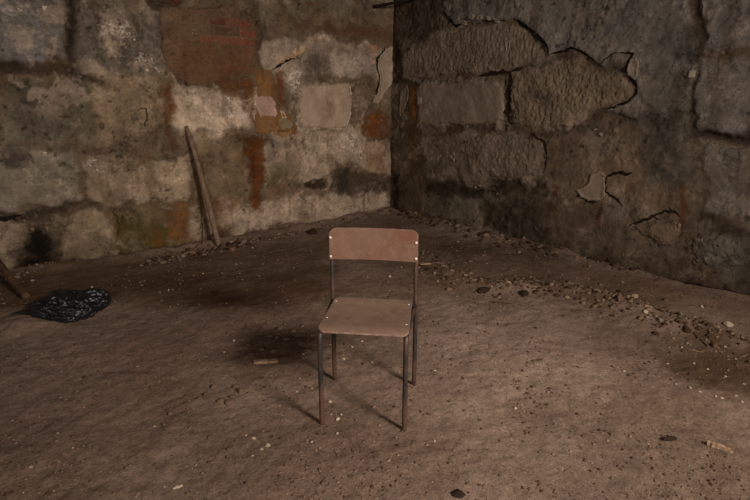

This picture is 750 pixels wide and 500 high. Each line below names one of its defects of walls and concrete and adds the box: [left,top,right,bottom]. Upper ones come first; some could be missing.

peeling [254,46,306,138]
crack [271,55,301,72]
crack [364,46,386,118]
spalling [289,0,642,129]
damp [17,230,61,267]
rust [244,136,270,210]
peeling [576,171,606,204]
crack [630,207,681,225]